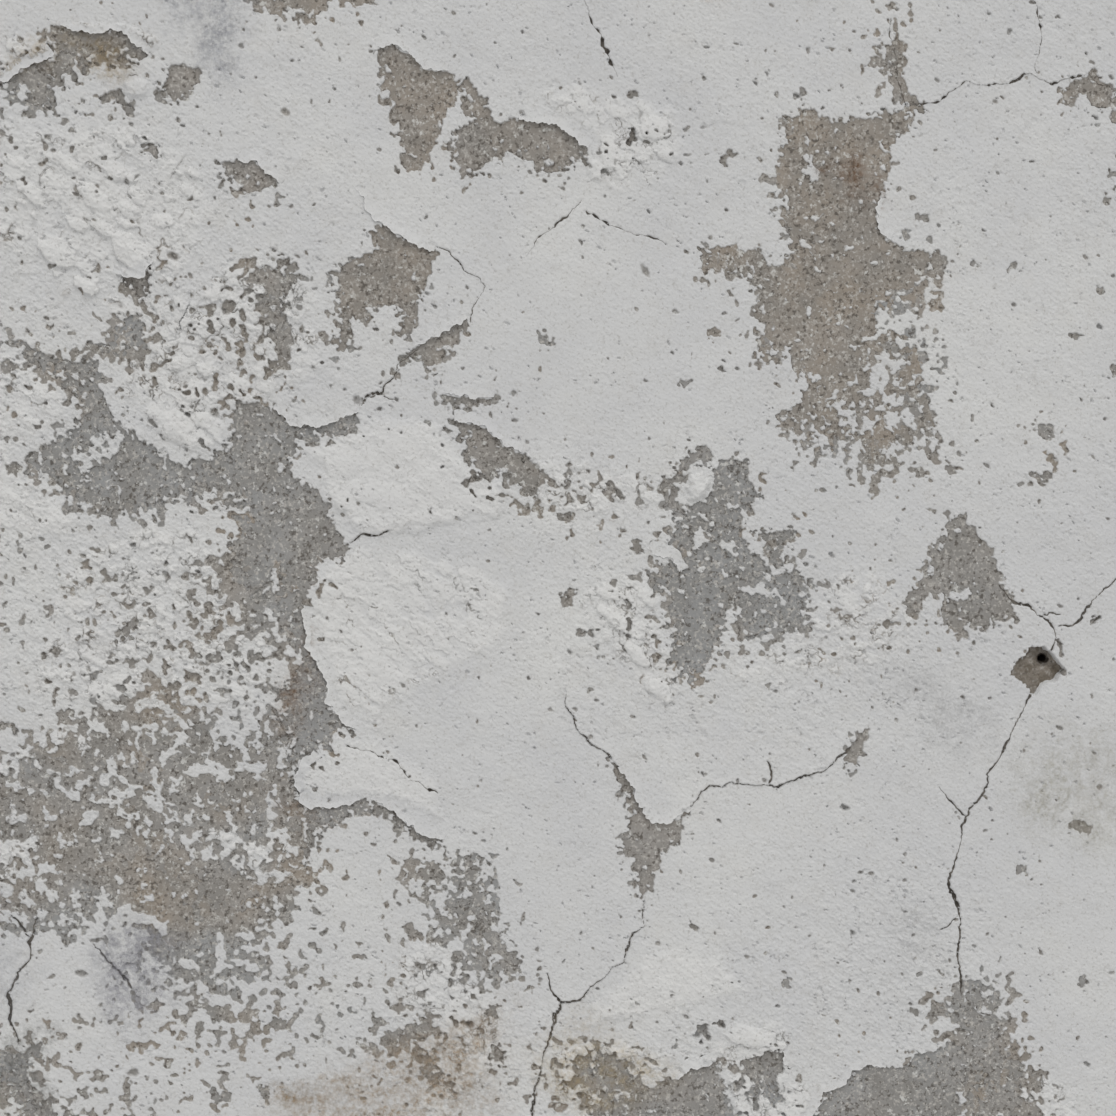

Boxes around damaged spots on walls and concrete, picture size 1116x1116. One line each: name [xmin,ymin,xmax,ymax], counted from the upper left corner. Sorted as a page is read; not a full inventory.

peeling [375,30,594,179]
peeling [328,182,469,379]
peeling [697,49,946,470]
peeling [13,313,446,895]
peeling [630,446,811,685]
peeling [902,513,1019,632]
crack [999,579,1116,651]
crack [565,698,611,758]
crack [692,747,851,806]
crack [939,694,1031,996]
crack [530,901,645,1116]
peeling [801,984,1034,1116]